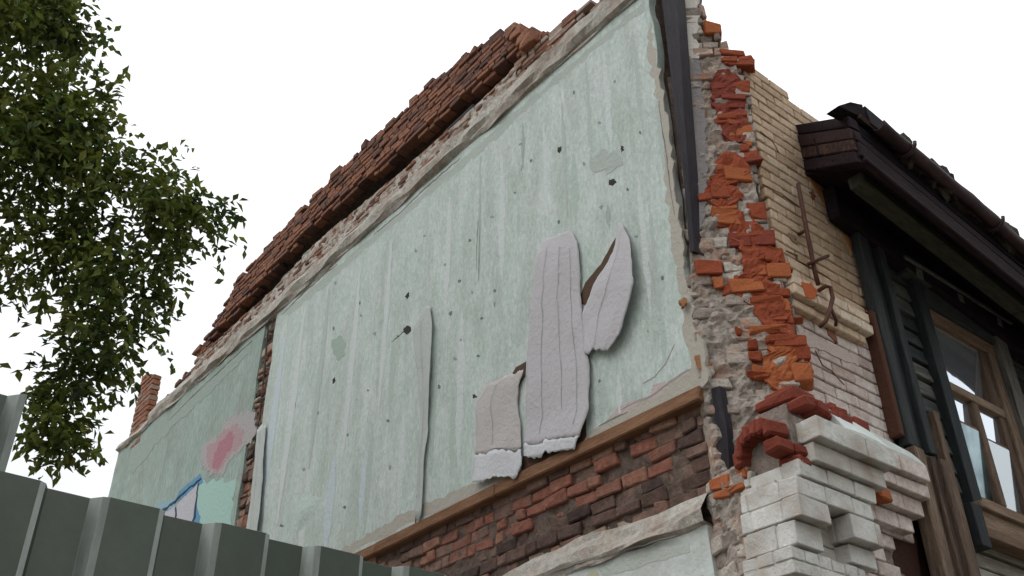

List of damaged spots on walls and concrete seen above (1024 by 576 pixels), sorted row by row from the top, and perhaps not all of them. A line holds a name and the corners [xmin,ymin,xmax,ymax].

spalling [182,0,603,379]
peeling [341,0,818,553]
peeling [247,423,266,531]